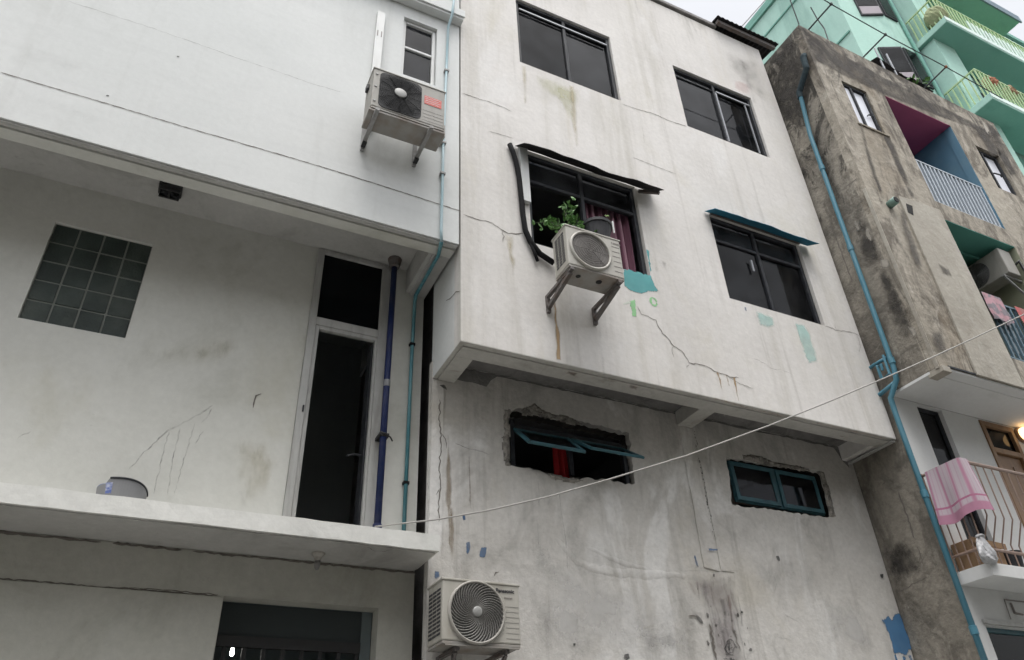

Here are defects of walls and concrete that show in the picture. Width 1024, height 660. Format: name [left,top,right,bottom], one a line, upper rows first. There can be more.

water stain [803,29,1015,174]
crack [1,72,523,238]
water stain [884,137,913,196]
water stain [902,212,921,265]
water stain [855,223,916,335]
crack [638,308,750,388]
crack [437,399,447,518]
flaking render [502,403,582,466]
flaking render [742,454,836,517]